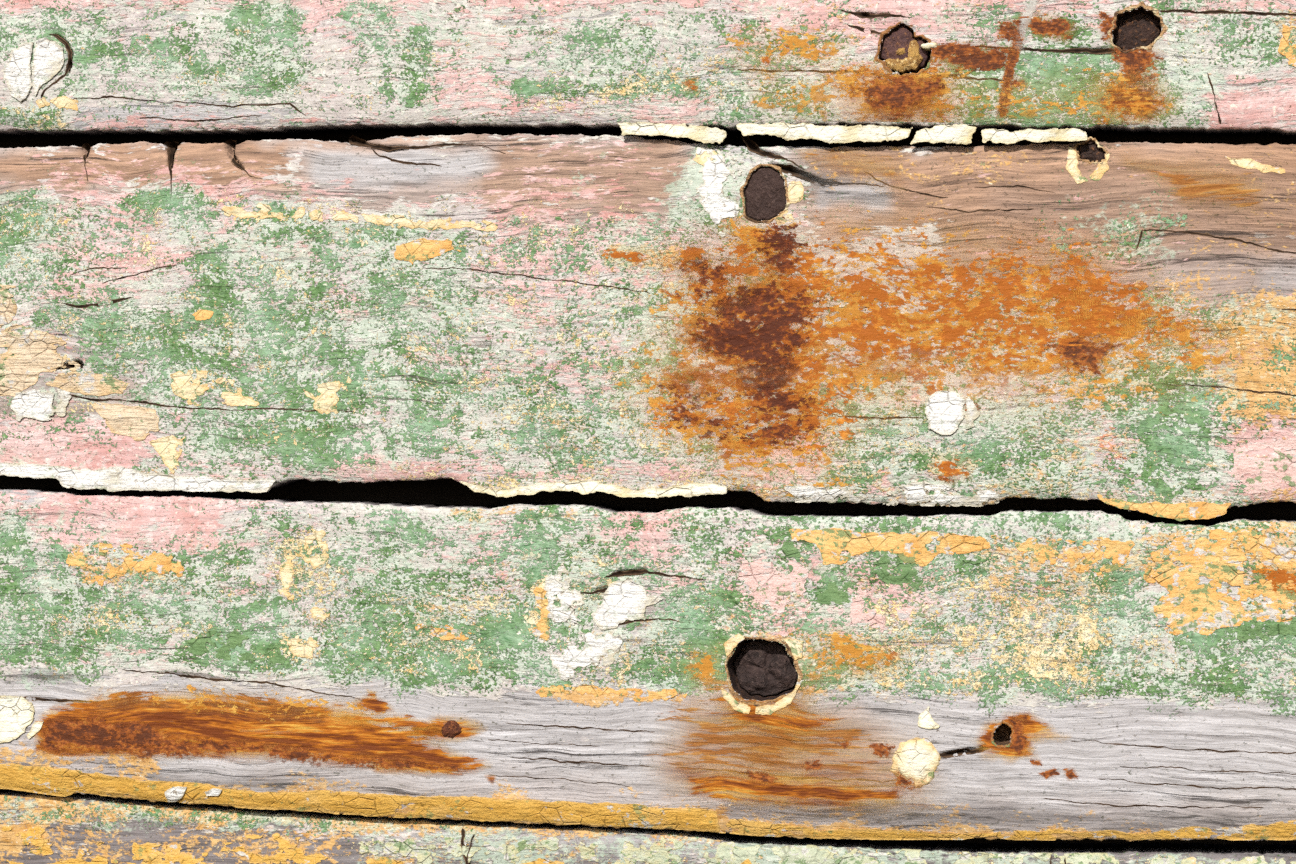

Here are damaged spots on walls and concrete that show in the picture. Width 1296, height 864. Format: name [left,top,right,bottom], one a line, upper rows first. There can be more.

crack [349,135,506,166]
crack [742,135,1050,213]
corrosion [725,11,1174,124]
crack [1207,73,1221,124]
corrosion [602,203,1268,497]
peeling [784,481,1000,507]
peeling [532,562,687,702]
peeling [737,528,1135,634]
peeling [1097,494,1296,641]
corrosion [35,685,494,782]
corrosion [651,628,920,804]
peeling [0,763,1296,864]